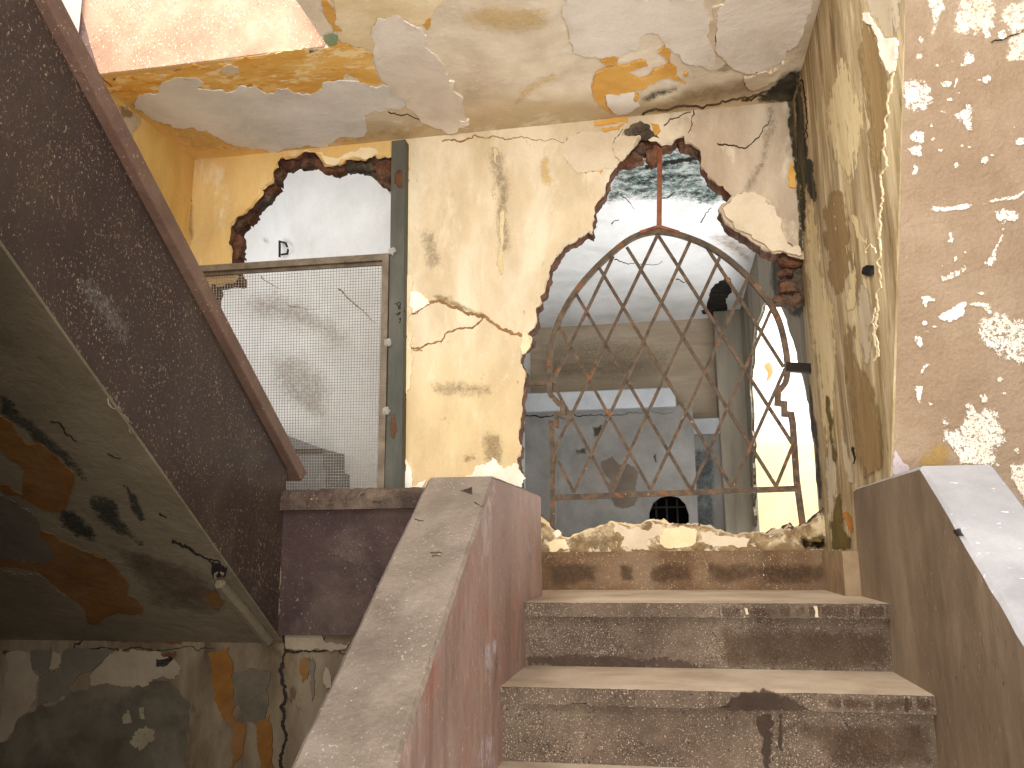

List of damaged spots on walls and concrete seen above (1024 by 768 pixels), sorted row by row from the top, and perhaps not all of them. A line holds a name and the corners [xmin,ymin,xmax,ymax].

peeling [104,0,469,261]
crack [442,134,564,143]
crack [642,90,772,169]
flaking render [541,0,902,552]
crack [411,299,529,351]
leakage [60,485,223,610]
leakage [652,566,688,581]
leakage [710,564,822,582]
crack [278,566,351,768]
peeling [285,635,351,701]
peeling [0,649,191,768]
leakage [756,714,783,768]